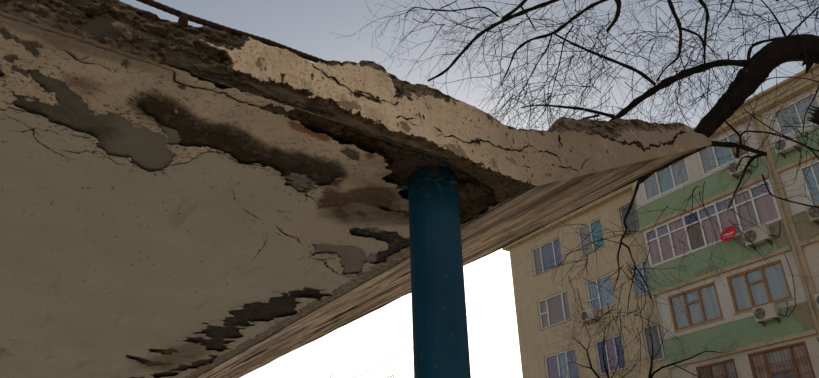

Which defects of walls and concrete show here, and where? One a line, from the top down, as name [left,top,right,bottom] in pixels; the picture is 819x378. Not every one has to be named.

crack [5,115,126,165]
crack [189,67,325,116]
spalling [0,0,532,224]
water stain [131,94,409,223]
crack [312,63,589,202]
crack [585,129,686,151]
peeling [313,212,410,275]
peeling [126,287,332,378]